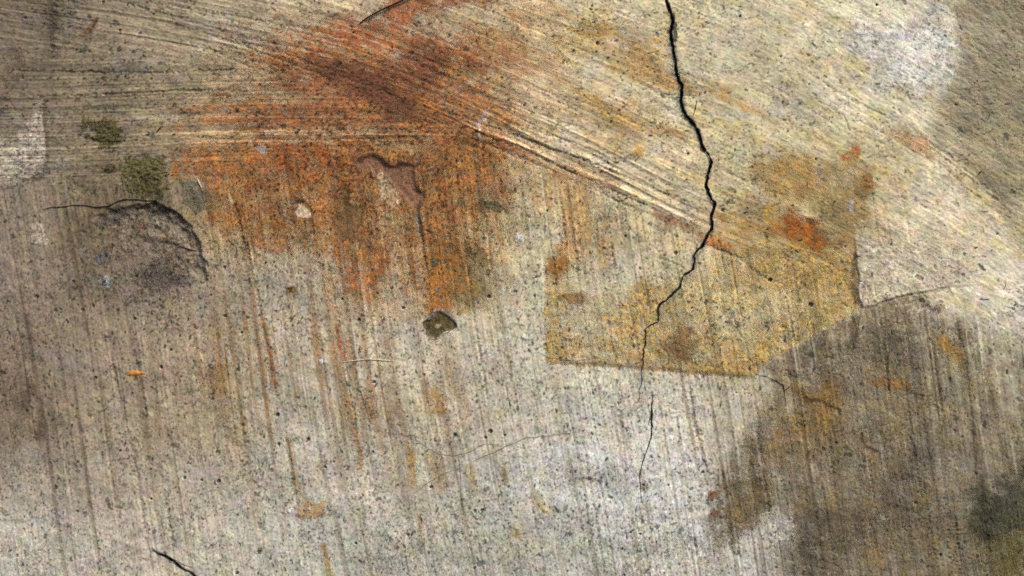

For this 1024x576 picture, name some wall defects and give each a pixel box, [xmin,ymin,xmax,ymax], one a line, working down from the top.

corrosion [243,292,276,416]
corrosion [310,297,380,469]
corrosion [170,0,536,313]
spalling [422,309,457,339]
corrosion [556,194,589,271]
crack [638,0,716,504]
leakage [532,169,1024,576]
corrosion [751,146,873,254]